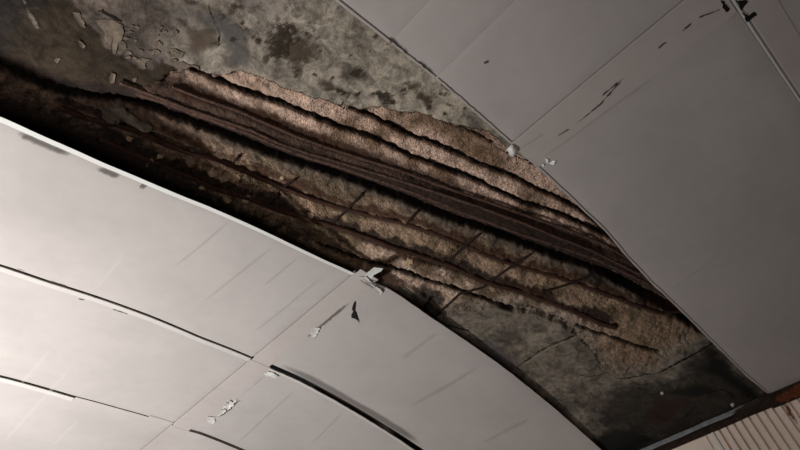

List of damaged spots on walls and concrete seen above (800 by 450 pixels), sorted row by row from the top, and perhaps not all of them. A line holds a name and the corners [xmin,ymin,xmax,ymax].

damp [192,5,330,78]
damp [312,66,365,98]
damp [371,82,431,110]
spalling [0,19,698,374]
corrosion [133,86,678,323]
damp [479,342,511,369]
crack [576,343,713,385]
damp [594,348,760,450]